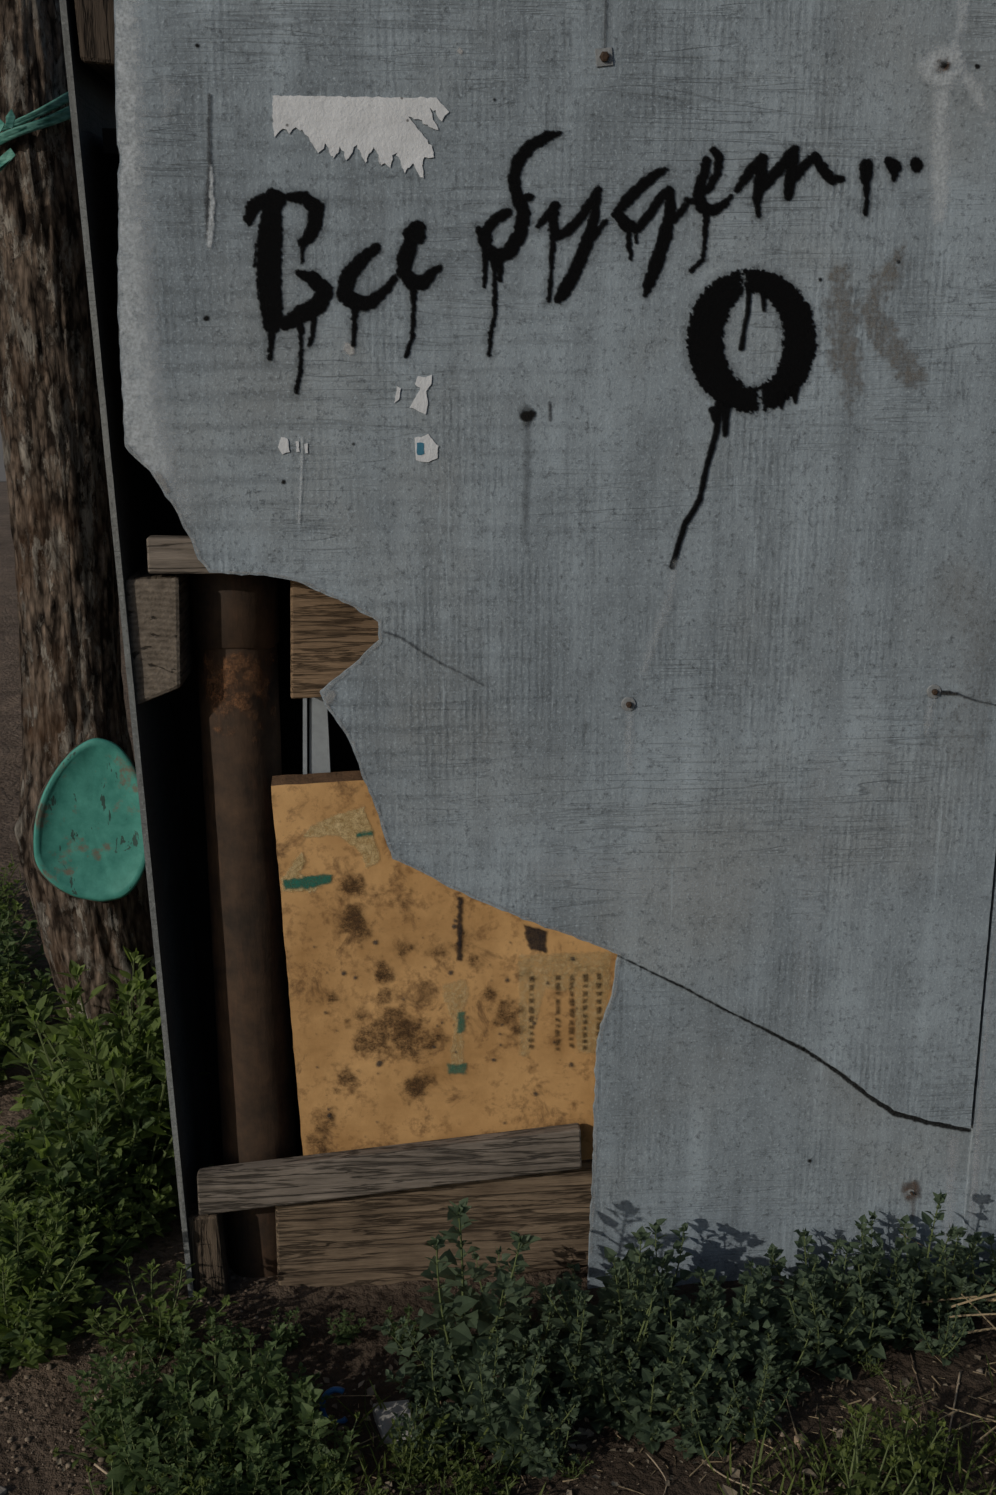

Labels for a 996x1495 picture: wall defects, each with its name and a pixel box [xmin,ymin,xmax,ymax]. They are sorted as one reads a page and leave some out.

crack [617,955,971,1132]